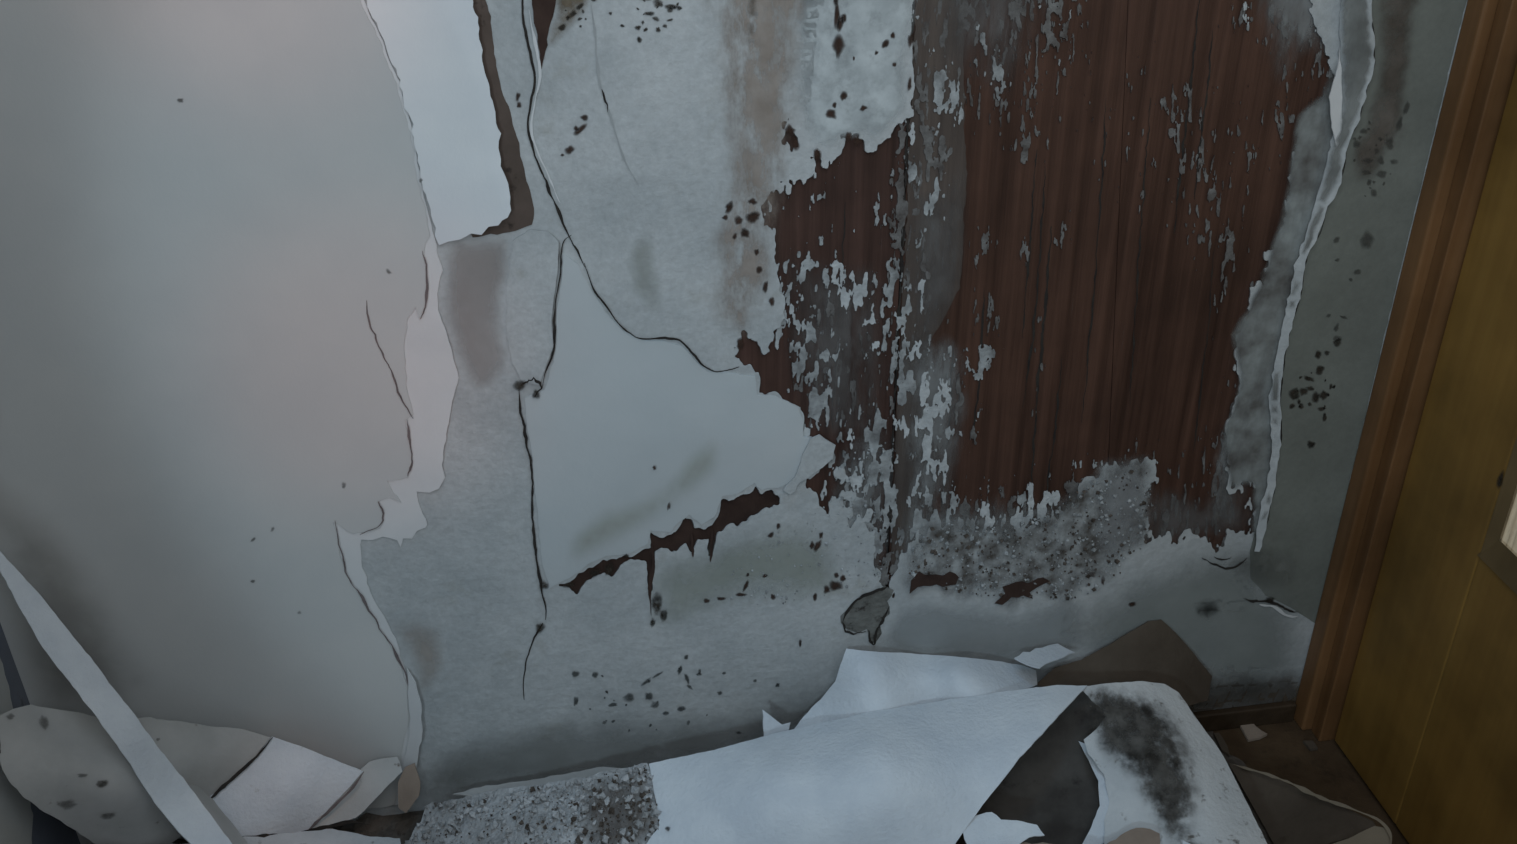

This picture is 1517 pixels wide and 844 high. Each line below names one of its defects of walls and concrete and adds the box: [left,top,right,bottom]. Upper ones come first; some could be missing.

spalling [532,0,556,69]
peeling [506,229,559,385]
crack [514,0,738,697]
spalling [559,0,1375,645]
damp [1290,315,1346,421]